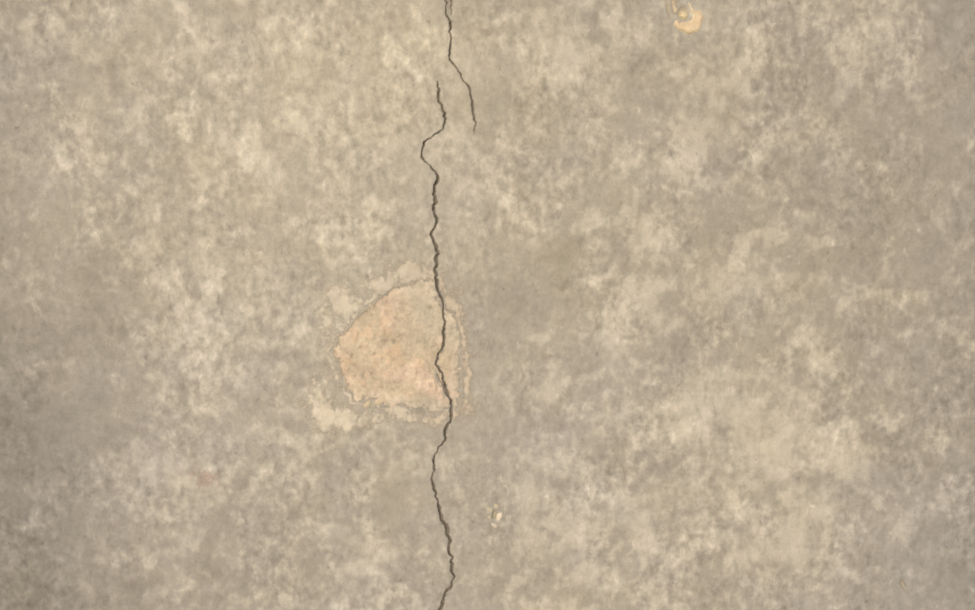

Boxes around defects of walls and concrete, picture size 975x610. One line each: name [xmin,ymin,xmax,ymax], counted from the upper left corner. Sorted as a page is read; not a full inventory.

spalling [302,258,474,434]
crack [417,0,480,610]